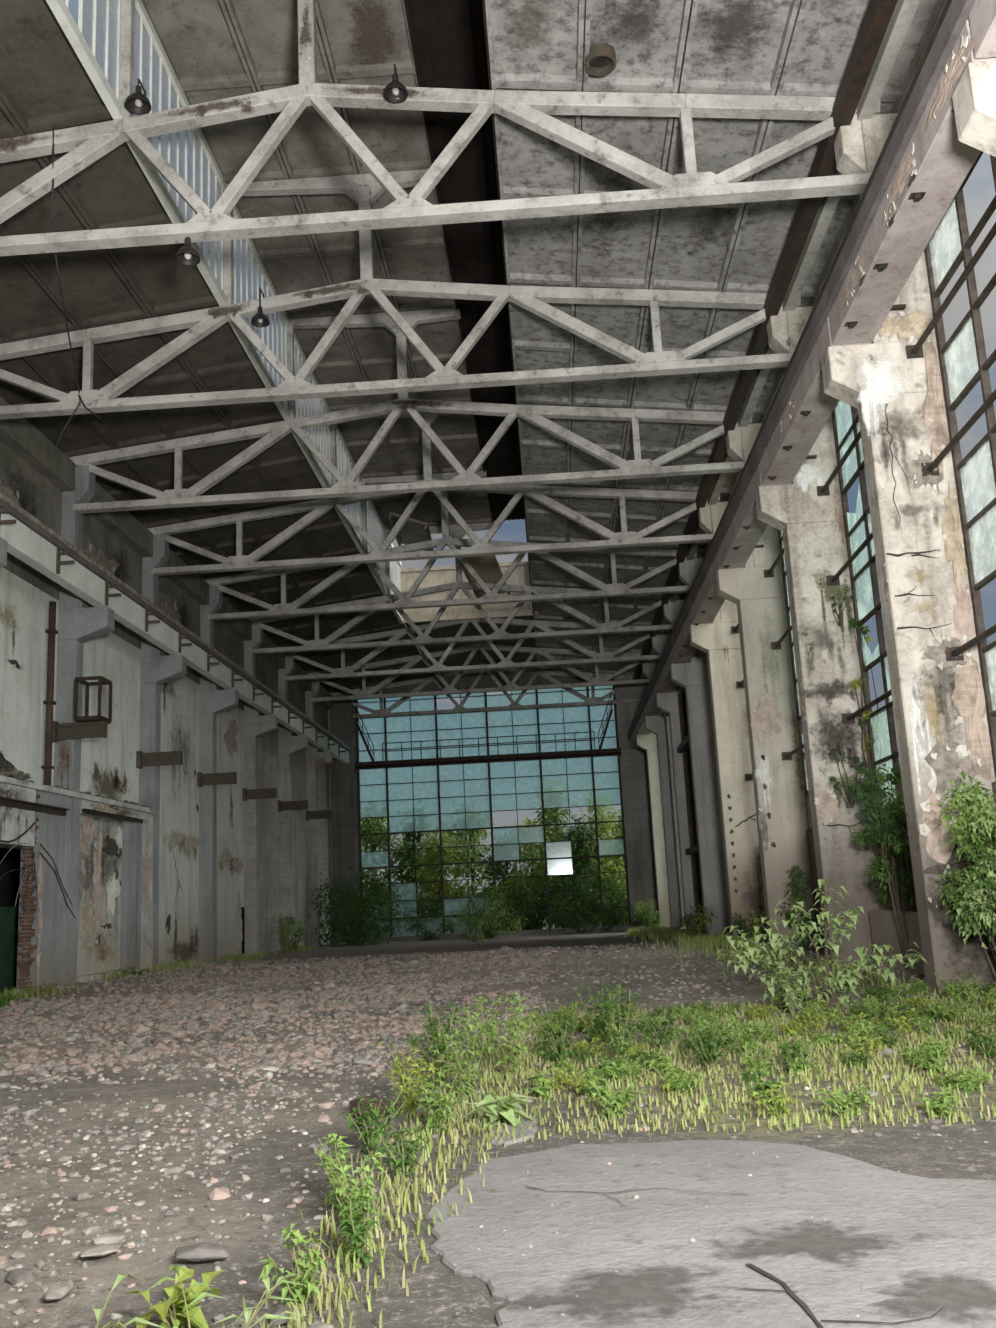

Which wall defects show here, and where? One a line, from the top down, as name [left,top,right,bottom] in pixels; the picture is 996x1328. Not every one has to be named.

damp [510,6,545,44]
damp [859,357,916,468]
damp [896,505,938,528]
spalling [878,309,991,874]
damp [804,580,859,769]
spalling [78,802,123,946]
damp [716,1222,889,1262]
damp [509,1267,713,1323]
crack [729,1263,943,1328]